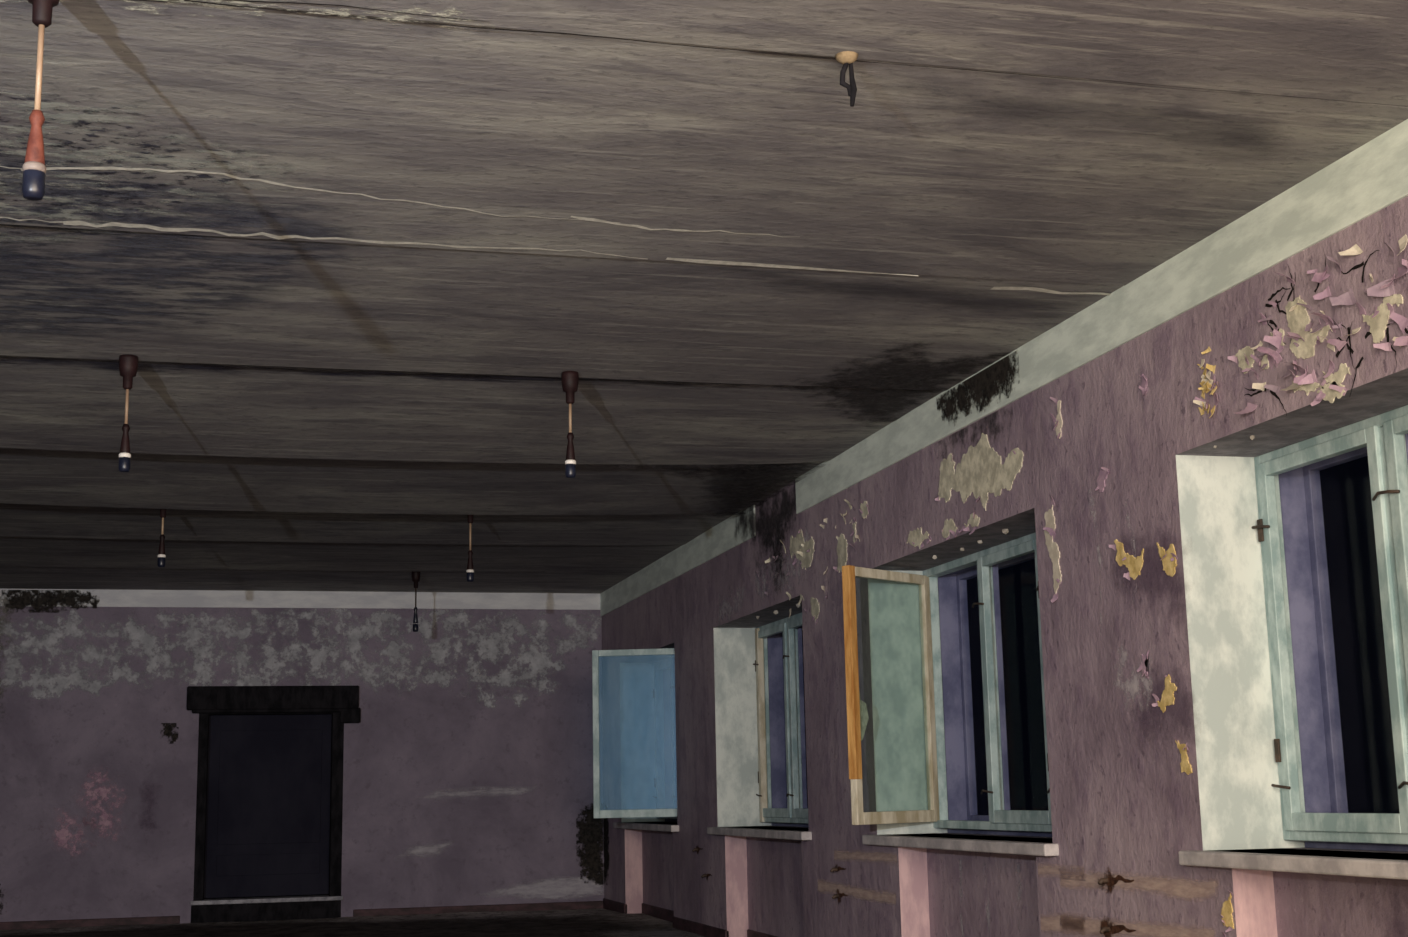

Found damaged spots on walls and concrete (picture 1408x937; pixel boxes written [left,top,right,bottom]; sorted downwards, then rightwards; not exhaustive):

crack [133,0,1264,96]
peeling [1193,234,1408,418]
water stain [795,344,1019,442]
water stain [655,463,820,621]
peeling [907,433,1024,559]
spalling [1109,539,1178,580]
peeling [0,608,602,708]